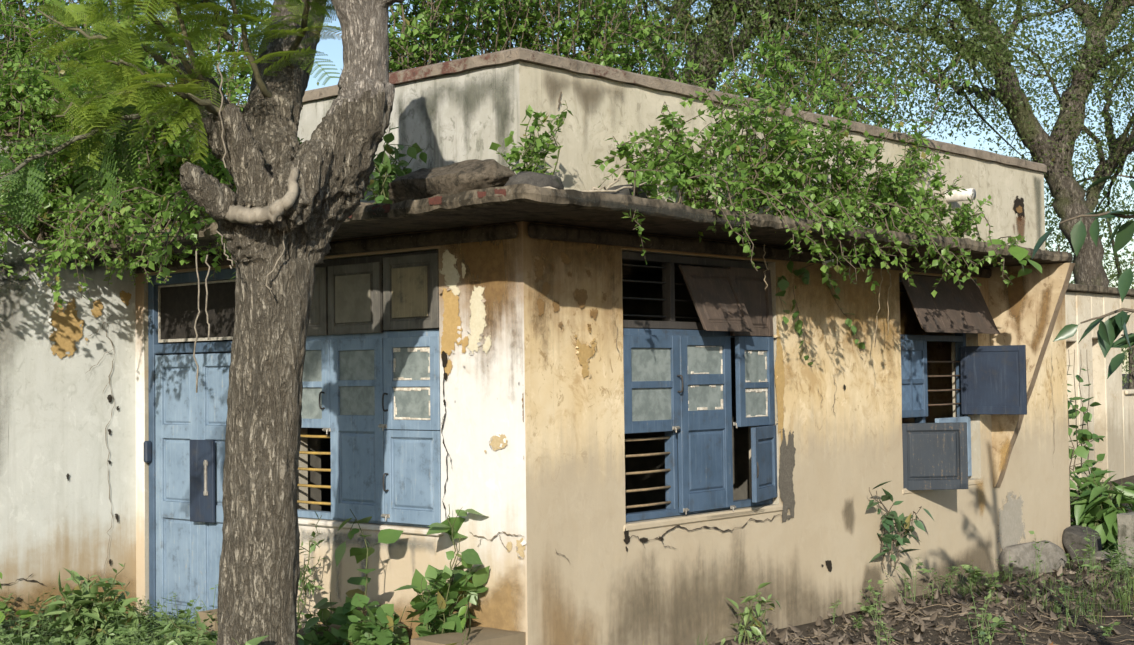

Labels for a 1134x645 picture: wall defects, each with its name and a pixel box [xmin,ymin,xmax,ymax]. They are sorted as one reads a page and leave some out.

water stain [547,77,600,103]
peeling [47,297,103,359]
peeling [119,290,131,306]
peeling [438,249,492,375]
crack [87,315,119,573]
peeling [484,432,508,453]
crack [470,531,522,551]
crack [627,514,779,549]
water stain [625,576,798,635]
water stain [862,569,881,607]